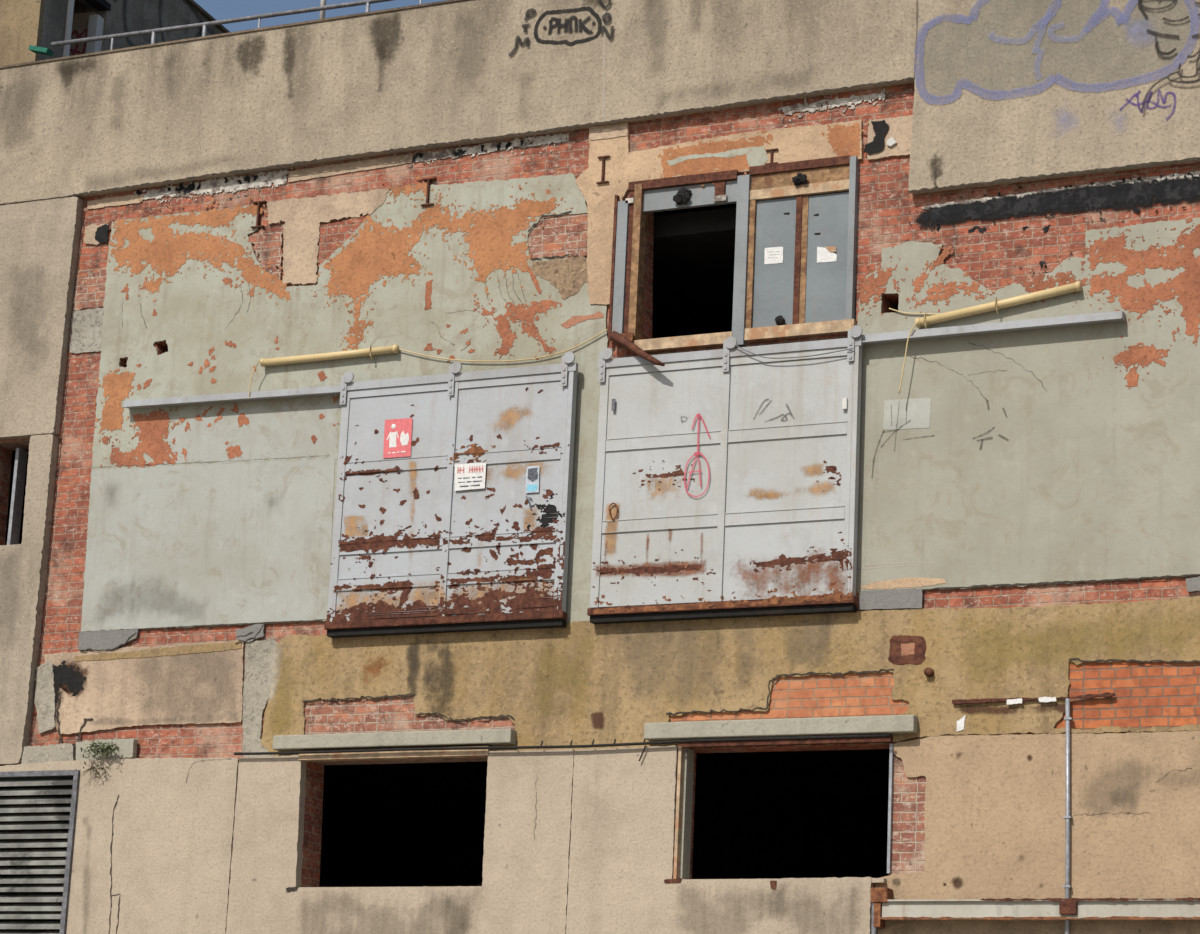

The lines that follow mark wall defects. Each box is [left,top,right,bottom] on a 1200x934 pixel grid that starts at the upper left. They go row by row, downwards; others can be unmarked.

water stain [58,61,95,86]
water stain [238,36,264,69]
water stain [372,17,399,58]
peeling [105,174,604,364]
peeling [860,200,1200,389]
peeling [94,362,249,469]
rust [434,410,527,500]
rust [633,460,695,493]
rust [325,442,565,628]
rust [590,505,852,614]
spalling [21,661,138,764]
water stain [408,645,453,712]